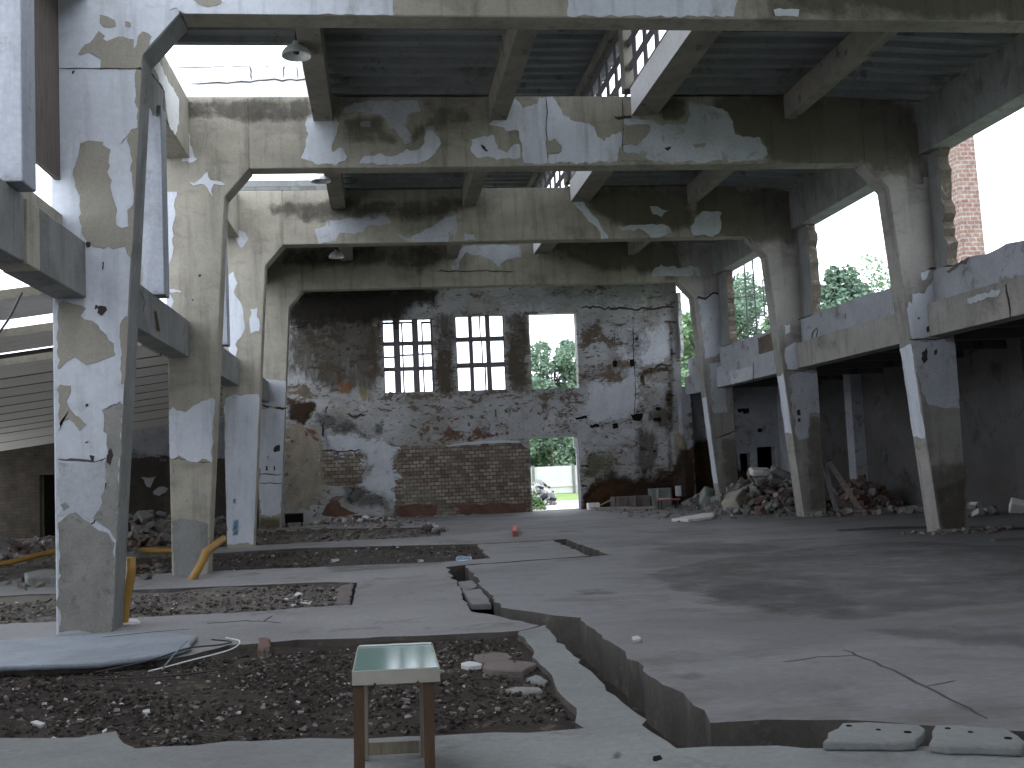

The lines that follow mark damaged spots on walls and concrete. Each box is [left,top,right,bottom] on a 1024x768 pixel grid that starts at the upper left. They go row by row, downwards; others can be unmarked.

peeling [73,14,169,270]
peeling [489,100,515,132]
peeling [546,138,562,154]
peeling [614,115,653,161]
peeling [650,206,668,217]
peeling [56,301,129,385]
flaking render [374,312,644,518]
peeling [265,415,365,517]
spalling [56,384,124,633]
crack [785,650,987,718]